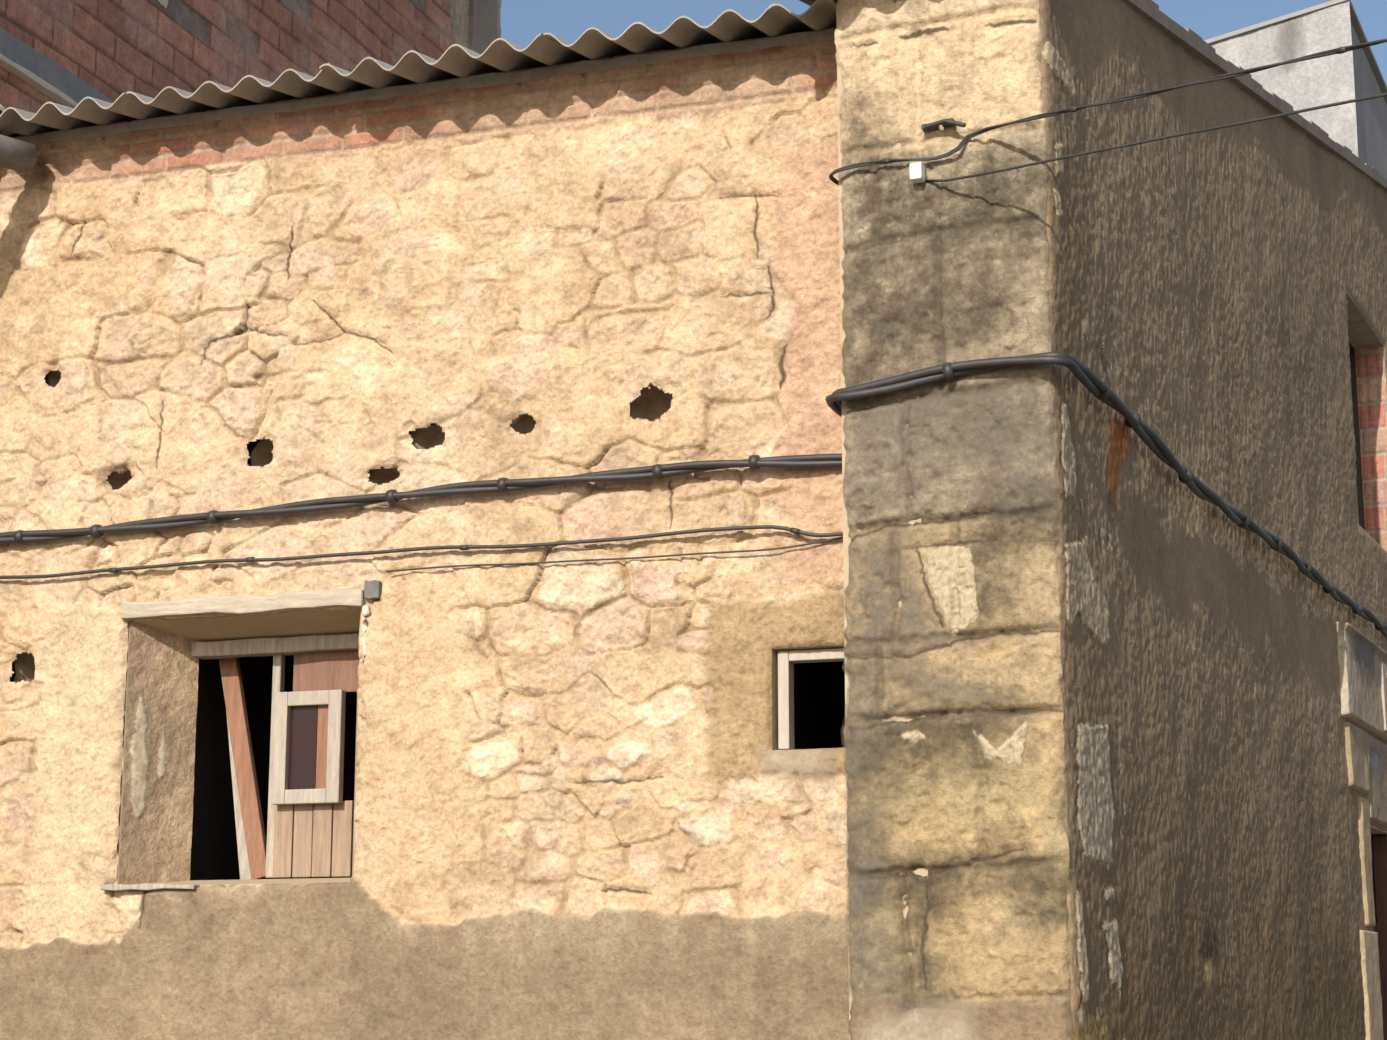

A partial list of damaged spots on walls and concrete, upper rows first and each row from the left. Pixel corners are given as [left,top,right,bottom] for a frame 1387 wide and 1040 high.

crack [200,226,392,365]
crack [721,194,787,388]
leakage [845,263,1013,383]
crack [155,400,163,461]
leakage [848,387,1051,544]
spalling [926,545,980,636]
leakage [974,545,1000,611]
flaking render [1060,403,1119,646]
crack [577,776,663,784]
leakage [848,549,938,997]
flaking render [1076,721,1125,900]
flaking render [1075,890,1125,1040]